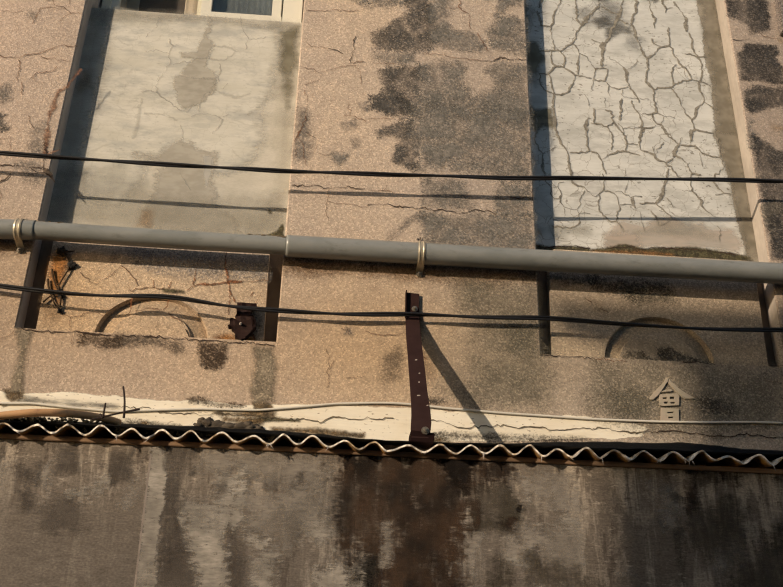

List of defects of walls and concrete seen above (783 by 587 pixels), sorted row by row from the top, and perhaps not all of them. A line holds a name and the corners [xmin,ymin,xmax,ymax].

crack [6,0,79,24]
crack [0,45,73,95]
leakage [295,110,311,158]
leakage [357,0,783,261]
crack [427,0,731,241]
crack [0,138,55,198]
crack [17,252,274,346]
leakage [77,334,184,353]
leakage [197,341,228,371]
leakage [188,396,364,438]
leakage [157,447,196,587]
leakage [331,431,588,587]